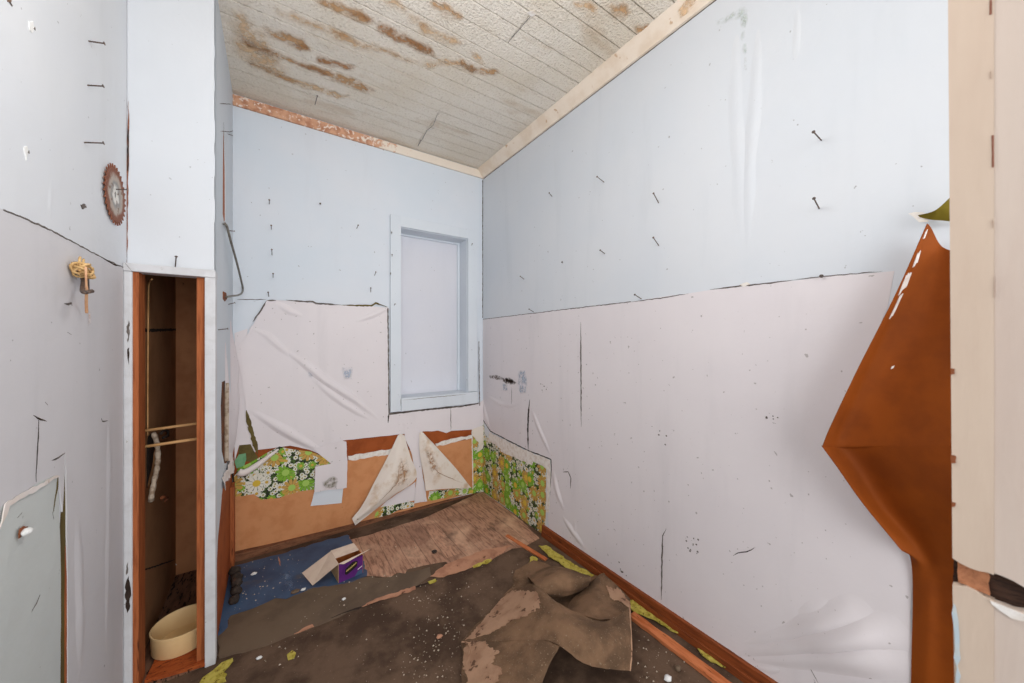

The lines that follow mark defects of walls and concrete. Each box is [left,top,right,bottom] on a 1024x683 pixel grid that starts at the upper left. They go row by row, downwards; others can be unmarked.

water stain [238,16,367,98]
water stain [321,1,457,66]
water stain [445,56,497,74]
crack [482,0,880,411]
crack [34,402,65,474]
peeling [348,449,391,461]
peeling [436,435,472,446]
crack [659,530,667,596]